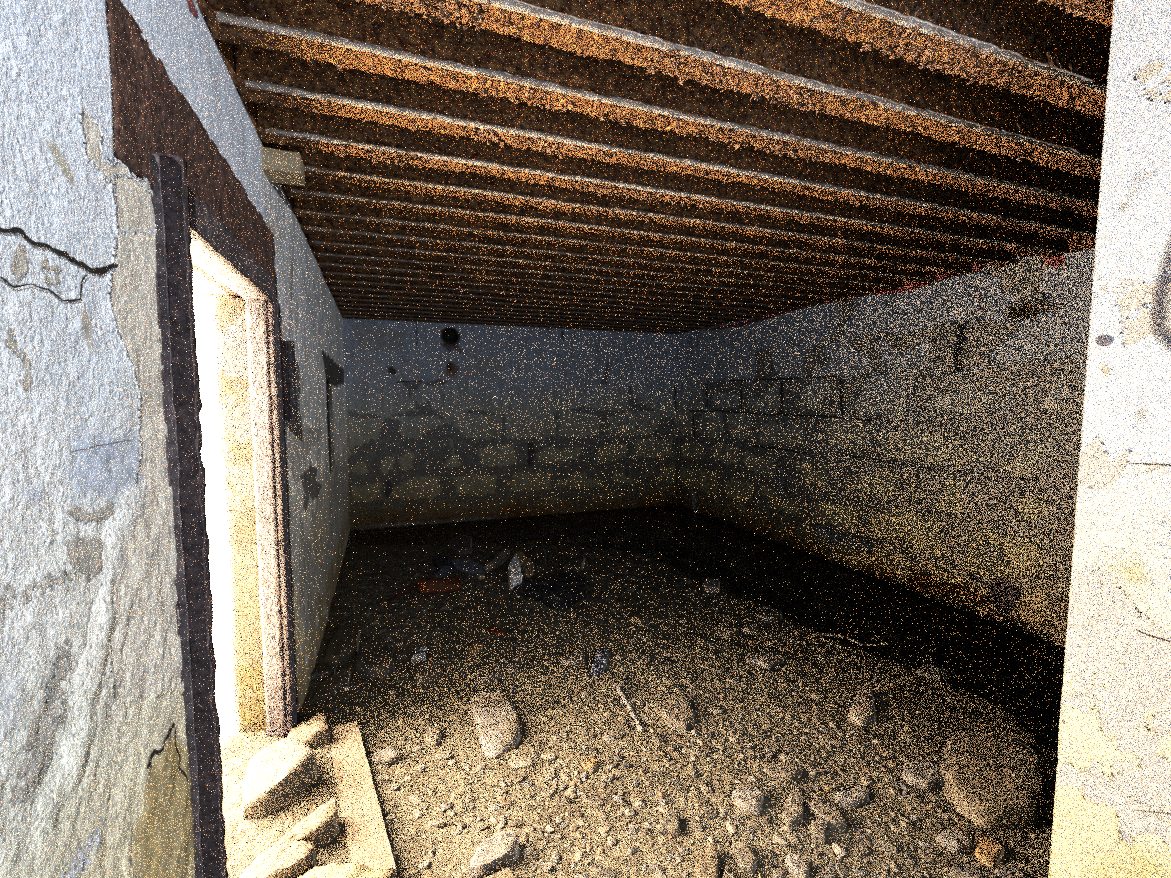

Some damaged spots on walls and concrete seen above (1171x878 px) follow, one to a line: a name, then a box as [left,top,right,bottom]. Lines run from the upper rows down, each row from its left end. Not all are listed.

peeling [1133,58,1171,117]
peeling [11,243,61,286]
crack [0,227,118,302]
peeling [78,95,185,732]
crack [67,440,131,454]
crack [1129,460,1171,468]
peeling [68,500,116,523]
peeling [0,536,103,622]
peeling [287,253,1171,852]
water stain [657,490,1042,644]
crack [1137,630,1171,643]
crack [1136,808,1171,816]